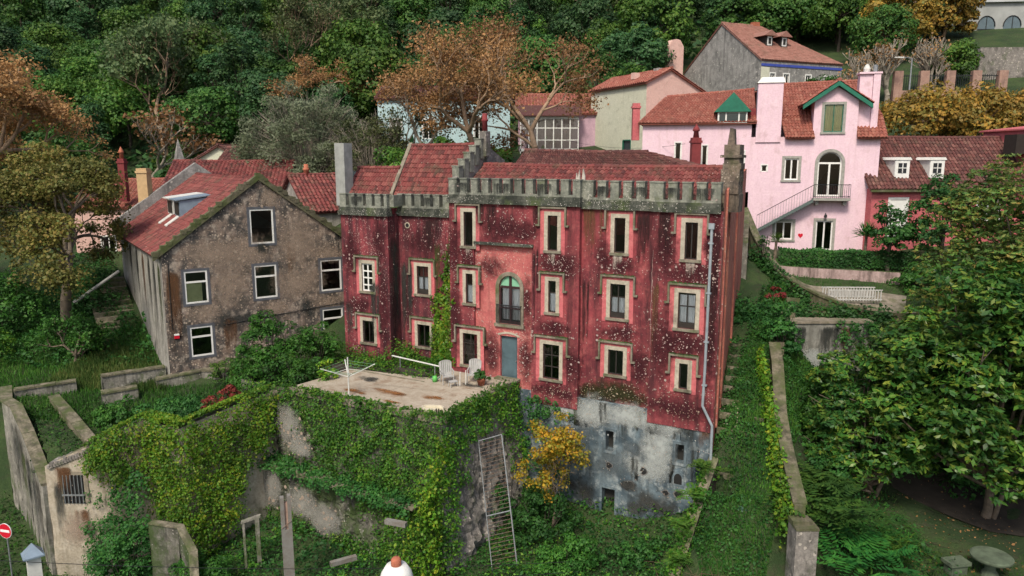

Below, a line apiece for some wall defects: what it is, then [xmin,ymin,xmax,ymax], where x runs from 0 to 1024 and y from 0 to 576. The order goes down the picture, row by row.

water stain [129,245,206,324]
peeling [403,194,738,503]
water stain [821,327,851,353]
water stain [597,444,674,515]